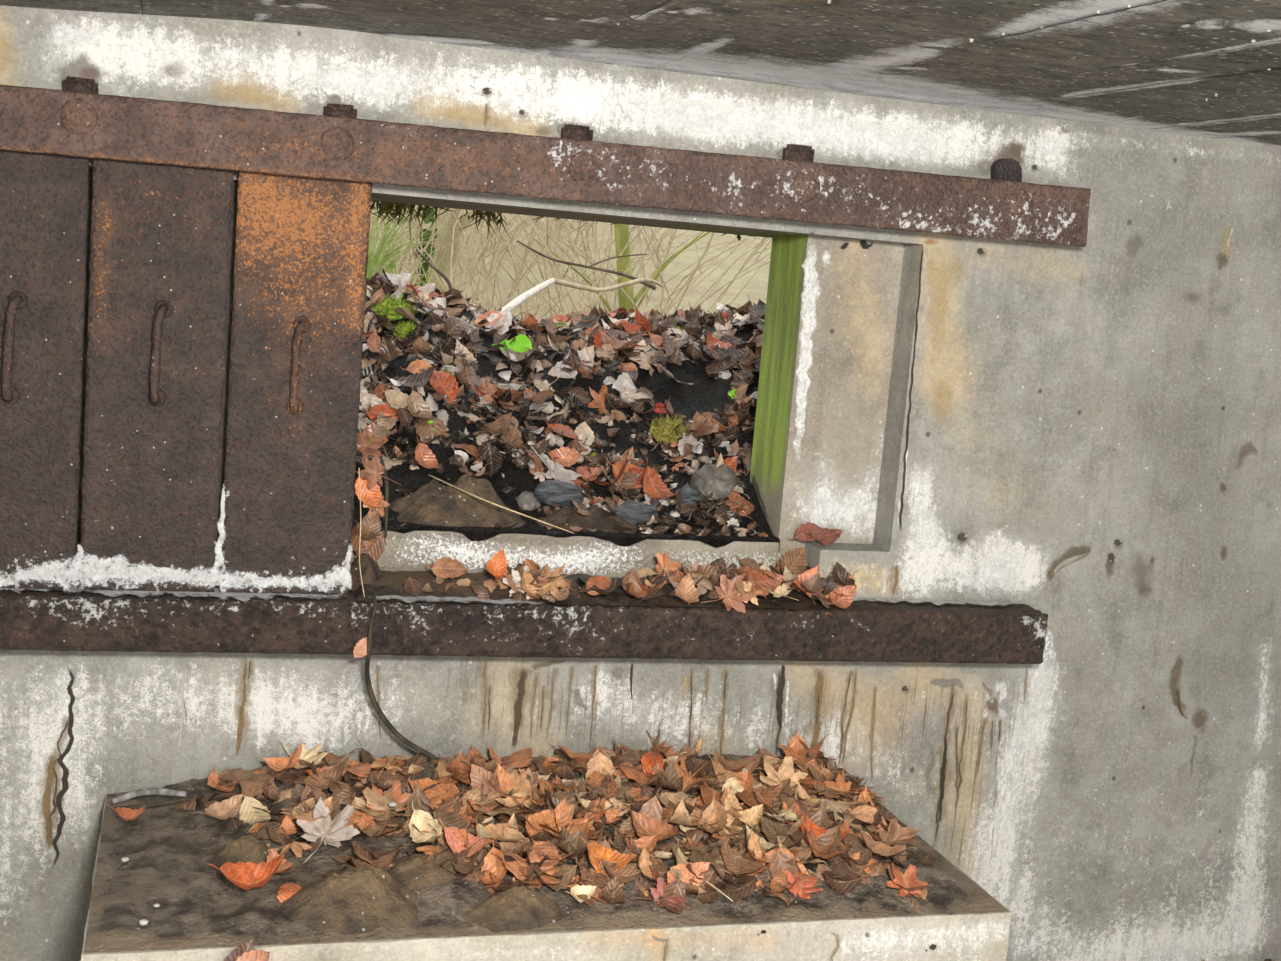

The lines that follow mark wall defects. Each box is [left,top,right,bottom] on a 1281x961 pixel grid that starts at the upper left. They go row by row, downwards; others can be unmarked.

crack [898,250,923,528]
damp [0,485,352,602]
damp [368,595,541,604]
crack [43,671,75,865]
damp [575,664,633,749]
damp [773,665,789,756]